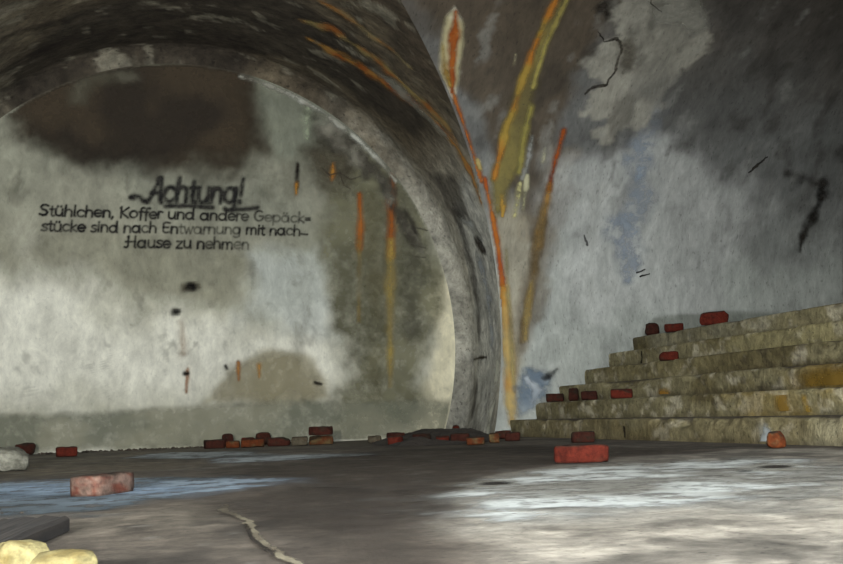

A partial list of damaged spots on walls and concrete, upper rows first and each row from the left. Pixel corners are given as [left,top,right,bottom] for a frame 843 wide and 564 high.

damp [0,65,448,463]
rust [303,0,568,420]
damp [799,180,827,250]